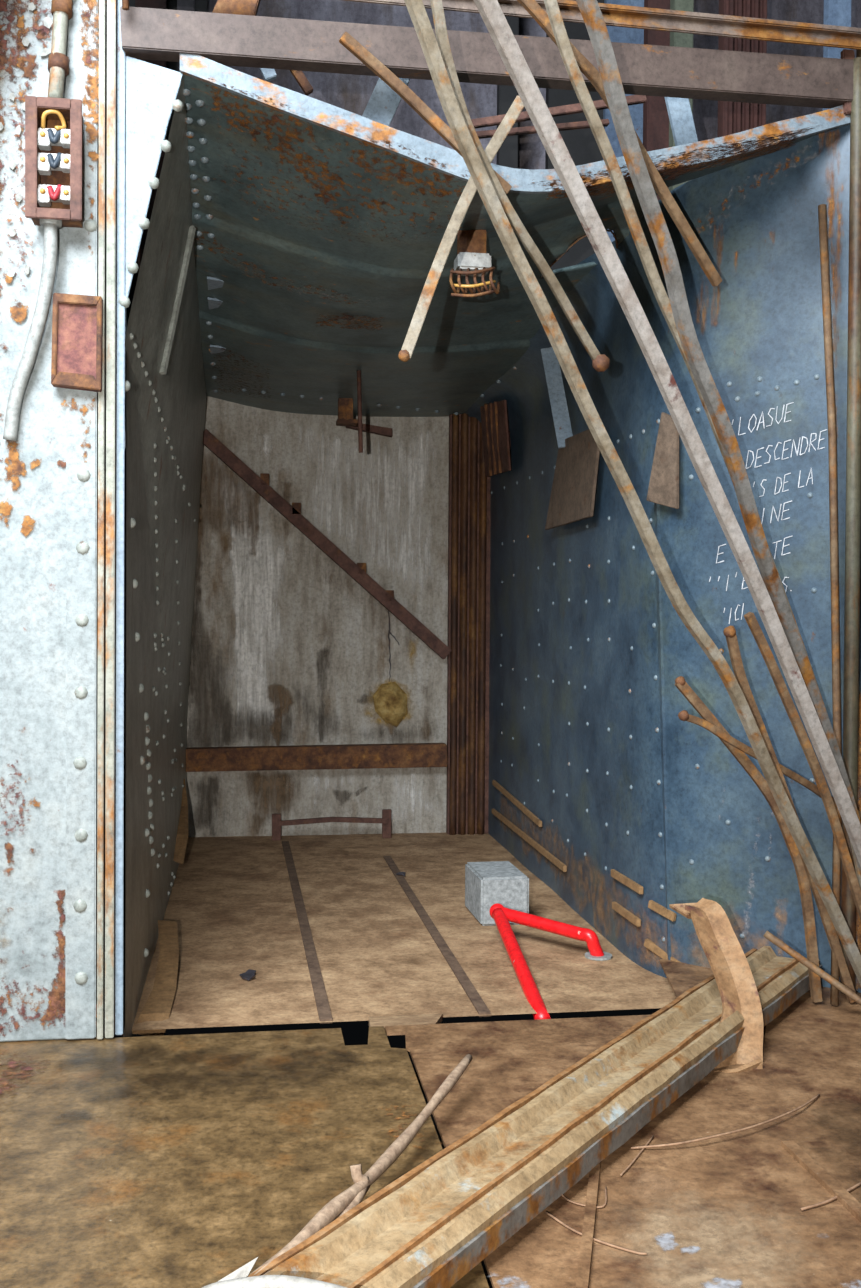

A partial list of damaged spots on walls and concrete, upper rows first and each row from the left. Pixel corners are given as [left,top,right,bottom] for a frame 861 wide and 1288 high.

corrosion [0,0,49,170]
corrosion [81,0,99,220]
corrosion [206,78,467,242]
corrosion [533,179,568,200]
corrosion [579,164,634,196]
corrosion [651,125,834,261]
corrosion [0,268,29,323]
corrosion [0,440,41,536]
corrosion [61,398,95,462]
corrosion [1,760,40,876]
water stain [249,773,294,828]
corrosion [0,889,66,1036]